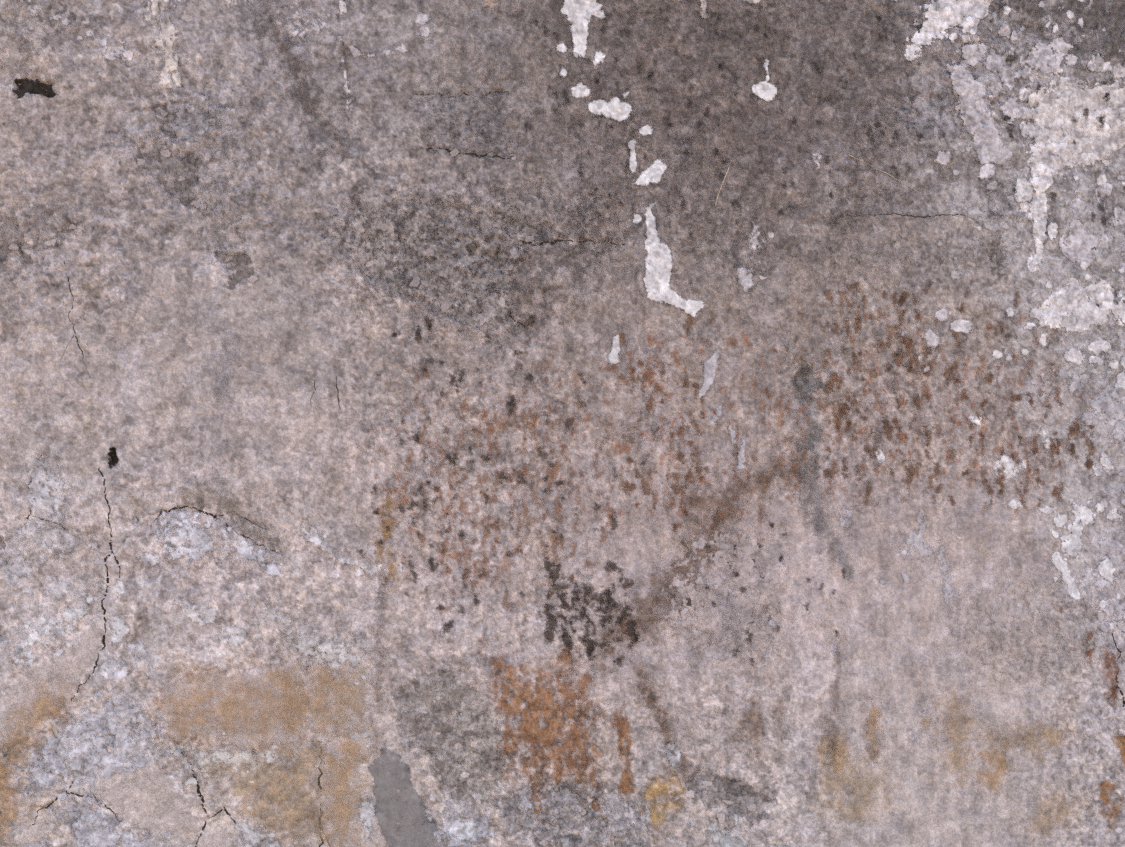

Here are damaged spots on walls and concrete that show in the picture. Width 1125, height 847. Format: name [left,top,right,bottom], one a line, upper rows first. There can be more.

damp [0,456,126,666]
crack [71,467,120,702]
damp [137,486,282,576]
corrosion [378,336,715,612]
damp [538,531,639,667]
corrosion [597,351,929,656]
damp [799,282,968,578]
corrosion [944,390,1063,485]
damp [982,390,1096,509]
damp [1,618,280,847]
corrosion [490,647,601,816]
corrosion [613,664,686,825]